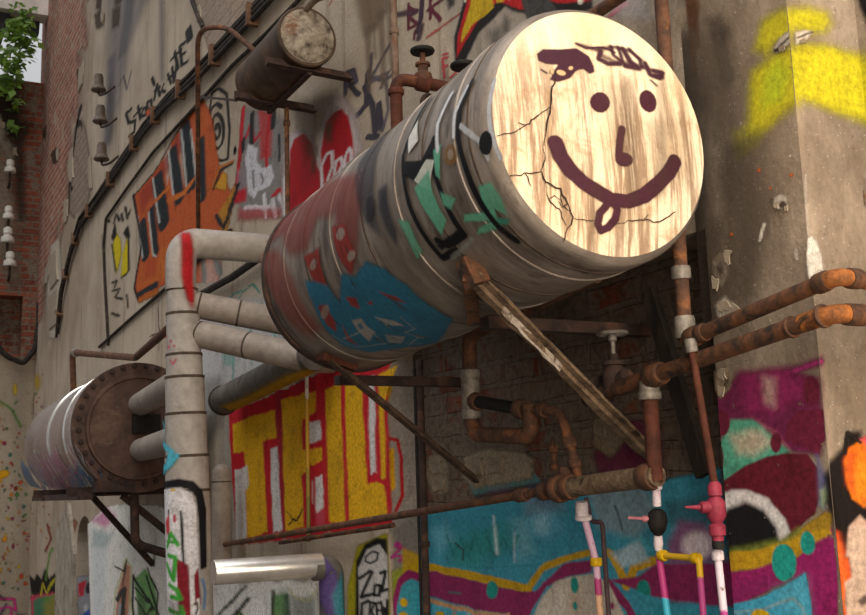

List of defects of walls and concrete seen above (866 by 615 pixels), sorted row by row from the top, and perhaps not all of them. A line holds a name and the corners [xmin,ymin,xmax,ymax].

peeling [500,306,562,372]
flaking render [426,454,449,496]
flaking render [462,449,534,489]